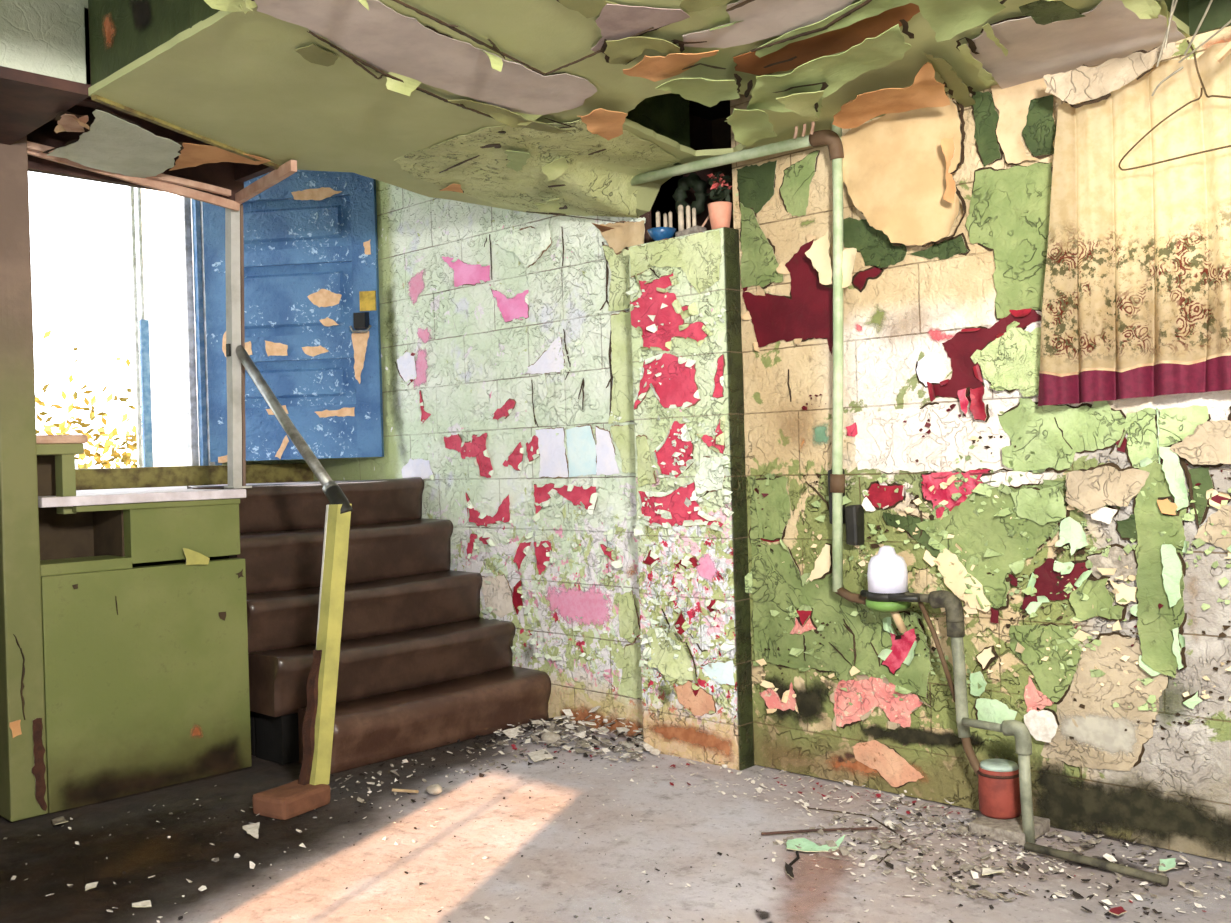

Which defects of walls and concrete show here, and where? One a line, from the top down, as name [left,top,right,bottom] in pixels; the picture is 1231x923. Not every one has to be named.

peeling [42,8,275,182]
peeling [204,0,1231,771]
leakage [65,742,241,807]
spalling [773,740,924,801]
leakage [1034,763,1231,854]
leakage [1072,857,1138,869]